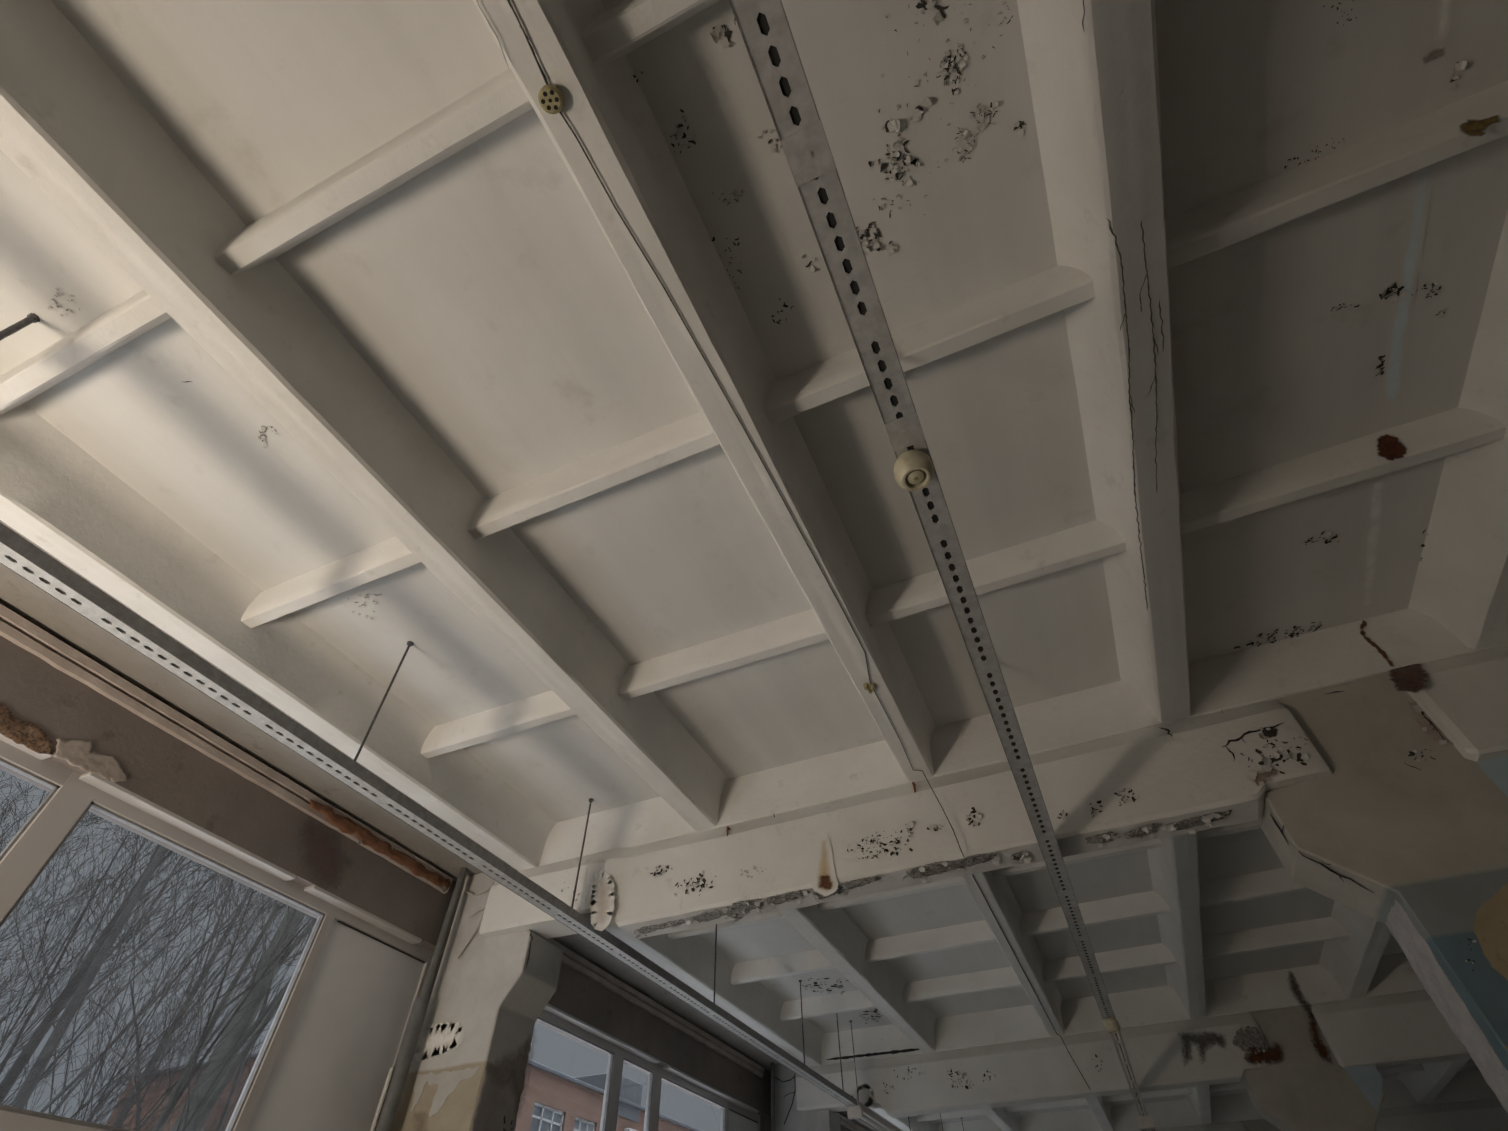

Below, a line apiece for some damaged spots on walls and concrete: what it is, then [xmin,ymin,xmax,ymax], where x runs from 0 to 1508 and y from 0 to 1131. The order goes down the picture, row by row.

peeling [856,0,1013,256]
corrosion [1460,115,1500,136]
crack [1106,218,1164,610]
corrosion [1377,434,1406,461]
corrosion [1360,621,1429,693]
flaking render [0,703,54,754]
spalling [1085,788,1232,848]
corrosion [812,836,838,896]
spalling [634,821,1033,939]
peeling [1385,900,1508,1113]
corrosion [1309,1015,1331,1063]
peeling [471,1069,525,1131]